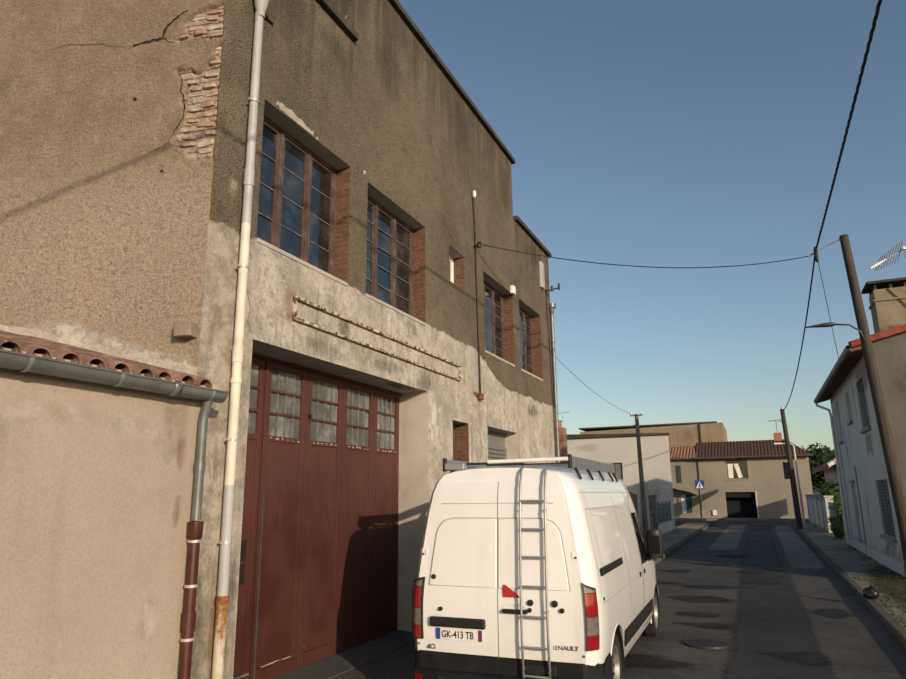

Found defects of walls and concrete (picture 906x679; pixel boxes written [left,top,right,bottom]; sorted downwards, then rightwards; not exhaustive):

crack [46,10,188,52]
crack [150,65,186,152]
spalling [173,5,224,160]